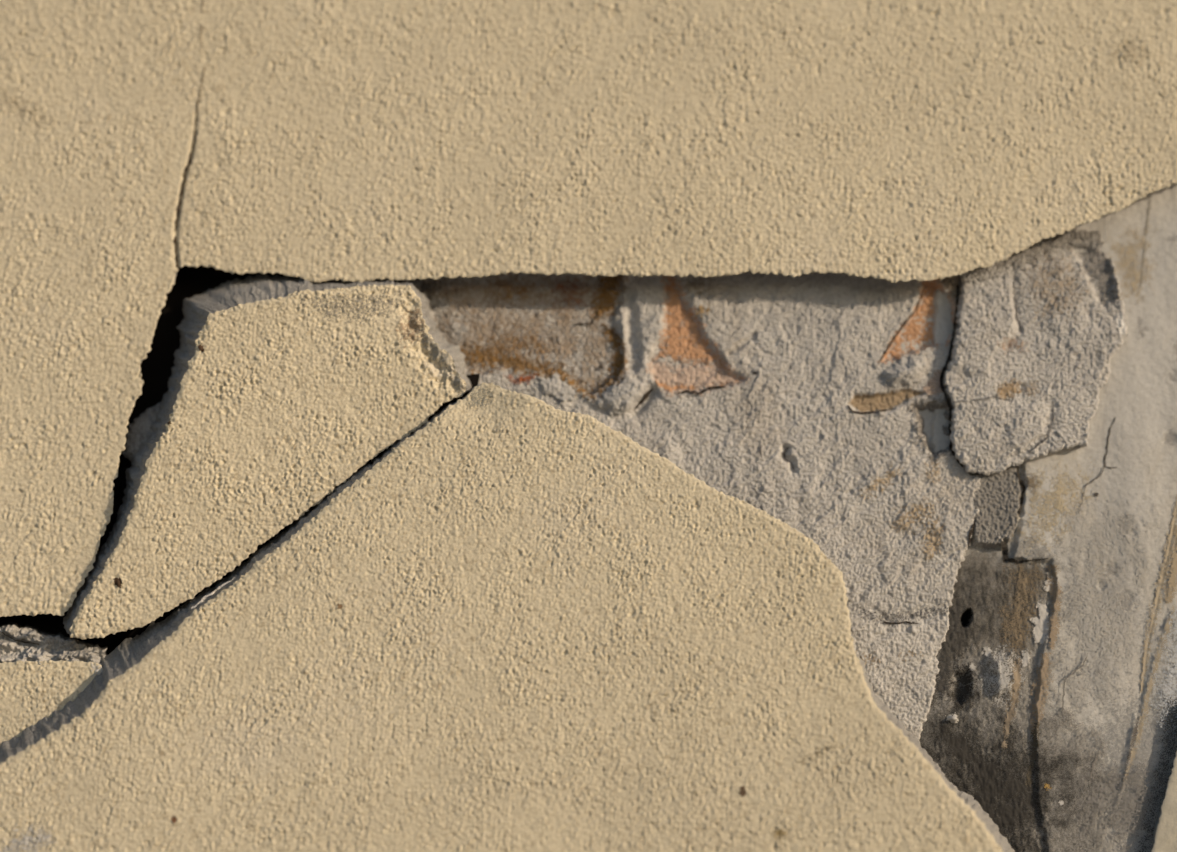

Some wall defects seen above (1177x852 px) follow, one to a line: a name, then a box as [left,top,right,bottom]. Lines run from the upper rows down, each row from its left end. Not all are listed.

crack [97,0,300,553]
crack [421,374,480,426]
flaking render [645,275,751,397]
flaking render [877,278,958,364]
crack [0,517,300,655]
spalling [0,382,506,764]
water stain [858,452,1177,852]
peeling [1021,572,1054,667]
spalling [851,635,1015,852]